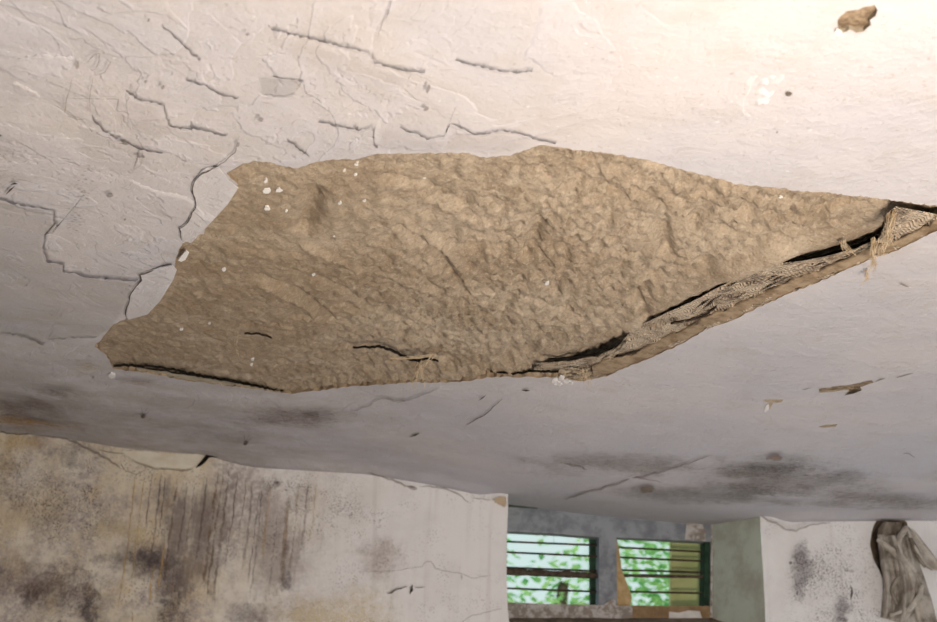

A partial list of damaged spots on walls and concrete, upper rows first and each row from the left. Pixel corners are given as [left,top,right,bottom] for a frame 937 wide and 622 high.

spalling [835,5,877,36]
spalling [0,12,937,395]
leakage [117,485,227,622]